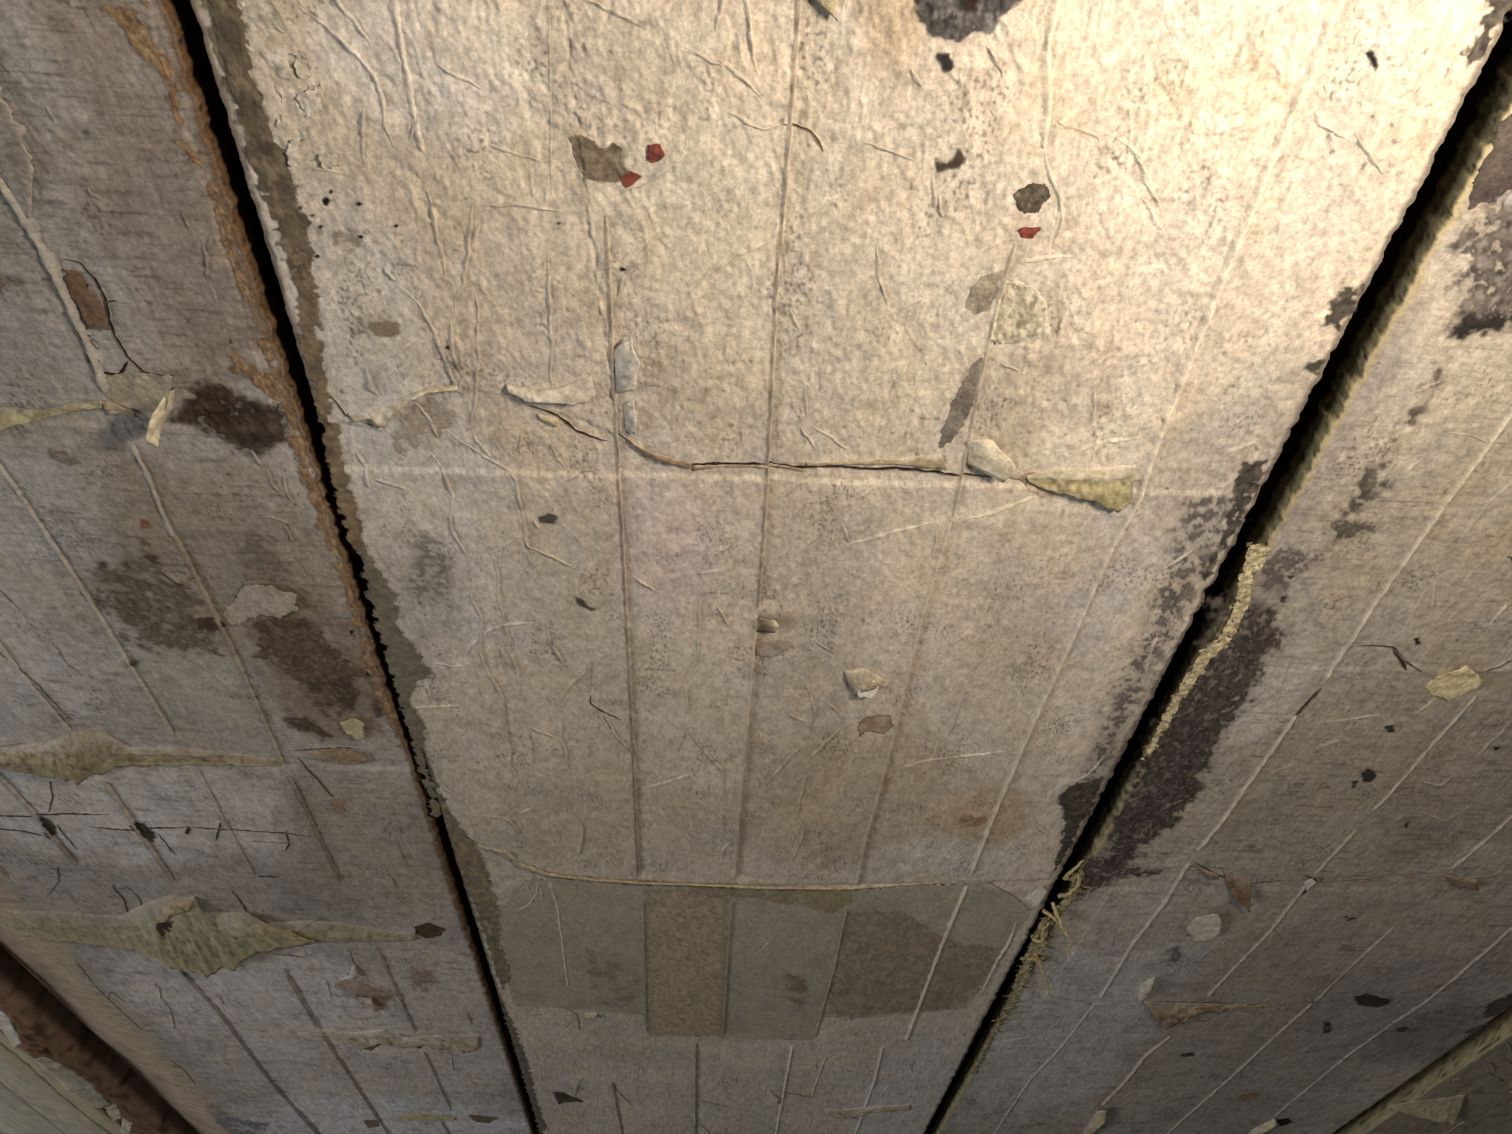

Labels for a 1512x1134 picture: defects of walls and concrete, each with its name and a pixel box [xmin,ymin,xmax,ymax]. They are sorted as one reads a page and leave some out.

mould [916,0,1023,72]
peeling [0,86,34,219]
mould [1448,188,1512,340]
crack [613,337,1020,483]
water stain [1408,406,1426,425]
spalling [102,0,1051,1134]
water stain [1332,464,1392,541]
water stain [1072,496,1322,901]
spalling [1054,776,1105,870]
water stain [1352,769,1377,787]